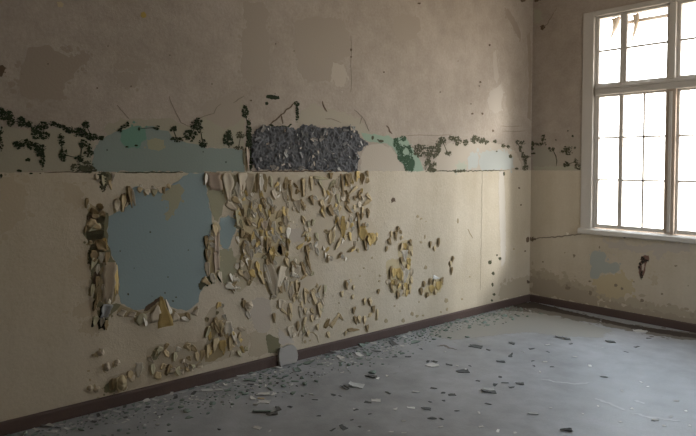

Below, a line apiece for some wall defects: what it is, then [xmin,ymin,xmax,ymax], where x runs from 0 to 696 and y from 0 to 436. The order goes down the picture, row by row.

leakage [170,90,246,152]
mould [393,136,415,172]
peeling [0,100,521,394]